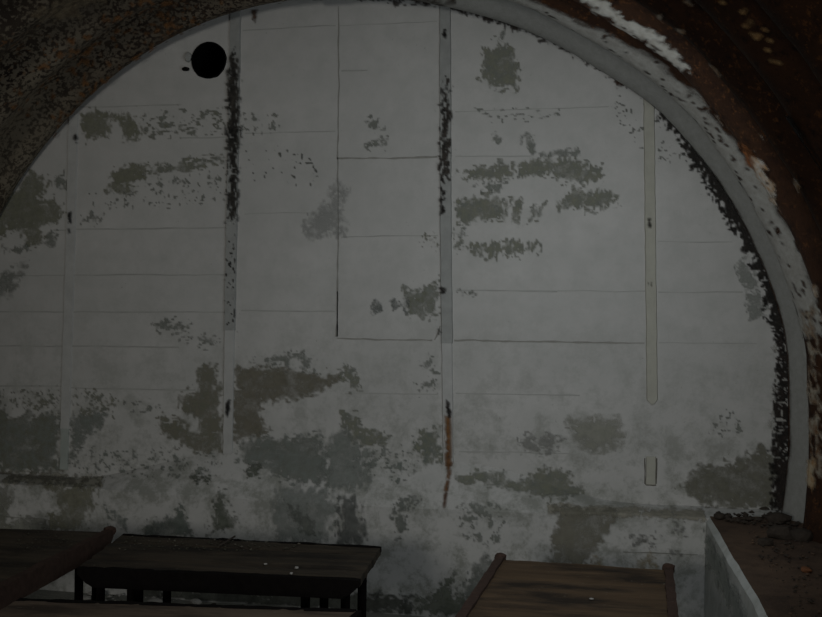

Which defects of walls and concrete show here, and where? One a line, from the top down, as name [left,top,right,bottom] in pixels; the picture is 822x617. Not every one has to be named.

peeling [450,8,573,92]
peeling [0,169,67,253]
peeling [80,109,226,141]
peeling [84,154,227,221]
damp [224,52,242,224]
damp [438,76,452,214]
peeling [455,133,618,261]
spalling [656,113,788,511]
damp [0,401,107,531]
damp [143,555,492,616]
damp [272,430,371,545]
damp [548,443,778,617]